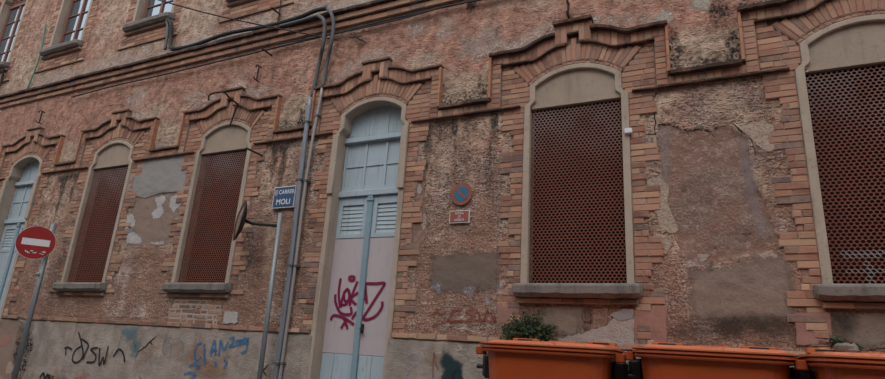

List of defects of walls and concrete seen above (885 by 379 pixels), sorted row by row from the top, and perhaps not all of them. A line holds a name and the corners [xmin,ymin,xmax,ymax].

leakage [669,33,741,75]
peeling [125,192,181,246]
spalling [658,125,778,268]